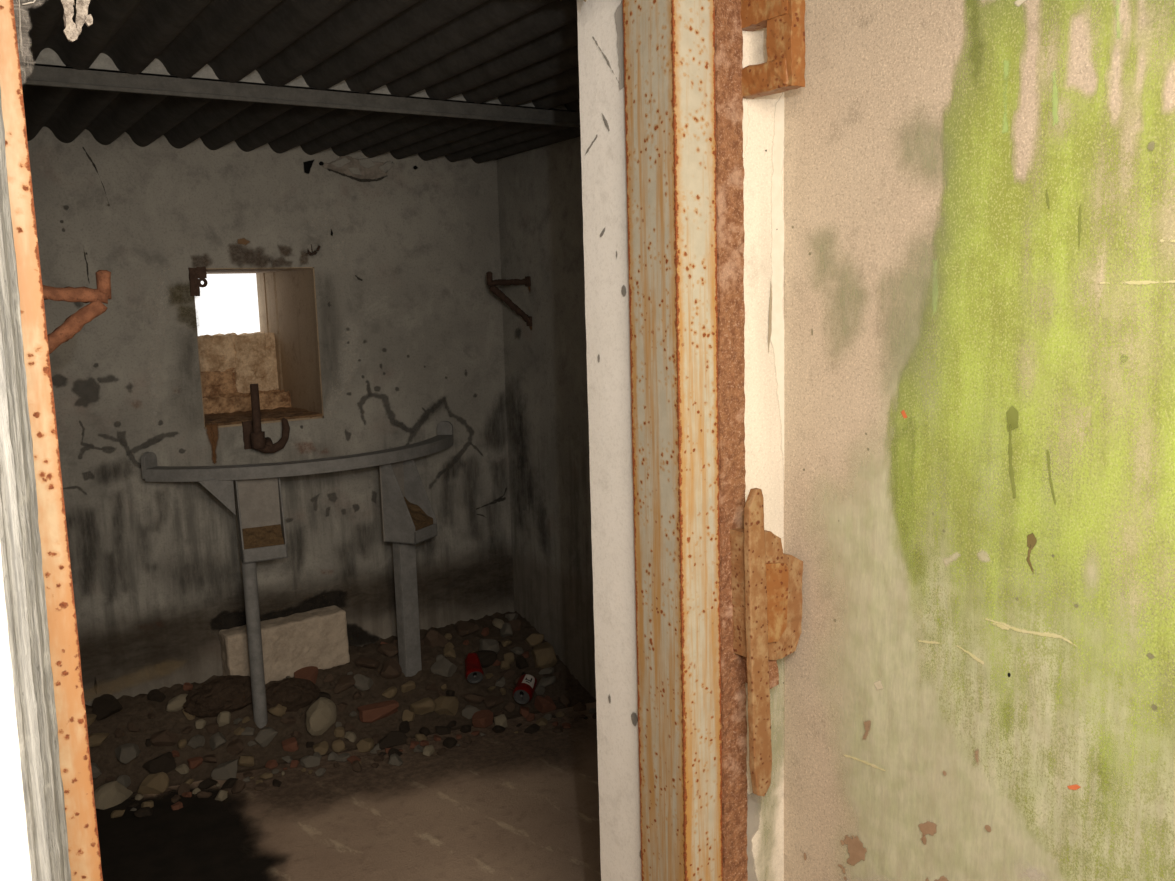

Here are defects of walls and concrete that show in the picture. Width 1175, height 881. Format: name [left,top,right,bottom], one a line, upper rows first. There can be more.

leakage [82,421,127,482]
crack [63,421,178,495]
crack [358,381,483,488]
leakage [1007,407,1018,498]
leakage [1047,450,1056,503]
leakage [259,593,316,616]
leakage [417,537,514,605]
leakage [1027,533,1037,572]
leakage [79,597,245,684]